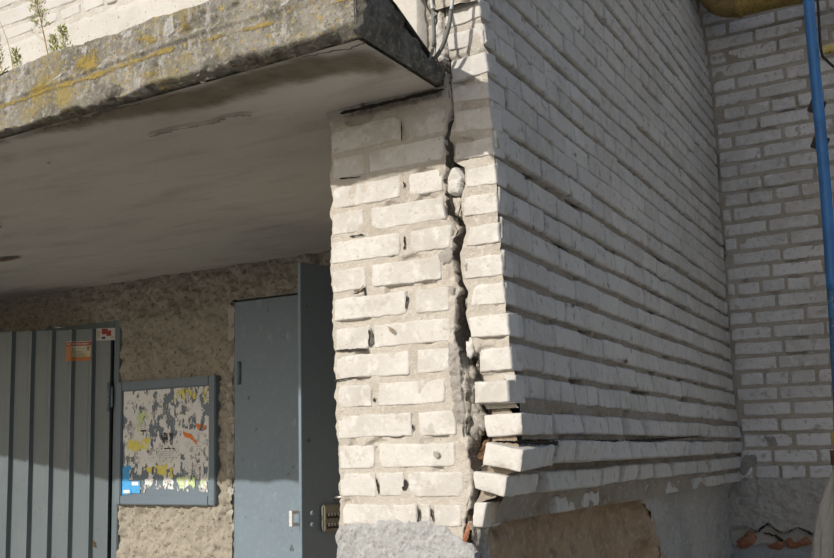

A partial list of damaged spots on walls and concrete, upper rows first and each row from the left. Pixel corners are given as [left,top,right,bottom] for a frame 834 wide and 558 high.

leakage [163,17,174,36]
leakage [33,55,393,134]
crack [425,0,562,544]
spalling [463,499,666,558]
crack [751,523,813,542]